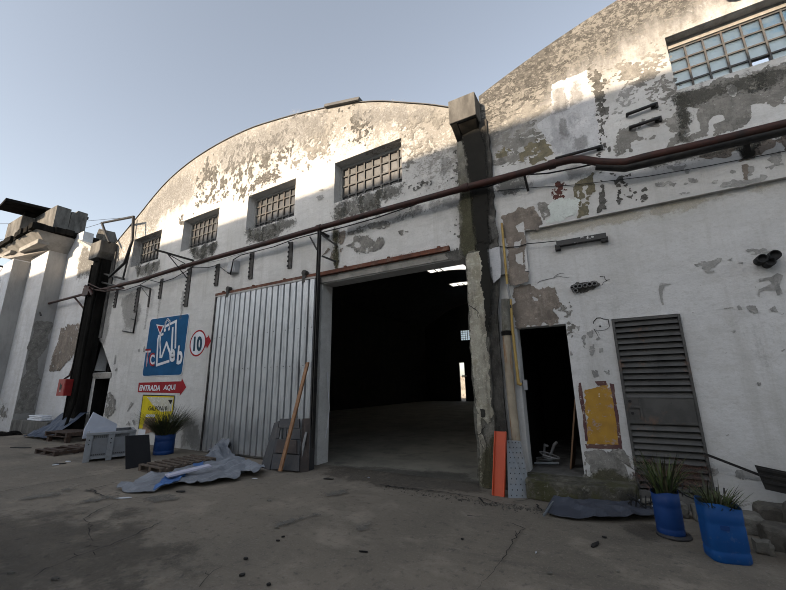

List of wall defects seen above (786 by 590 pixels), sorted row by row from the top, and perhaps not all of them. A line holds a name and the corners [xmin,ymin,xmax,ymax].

leakage [332,183,404,220]
peeling [573,164,698,218]
peeling [323,205,430,259]
peeling [486,202,603,356]
peeling [694,258,743,273]
peeling [758,273,783,297]
peeling [0,321,80,421]